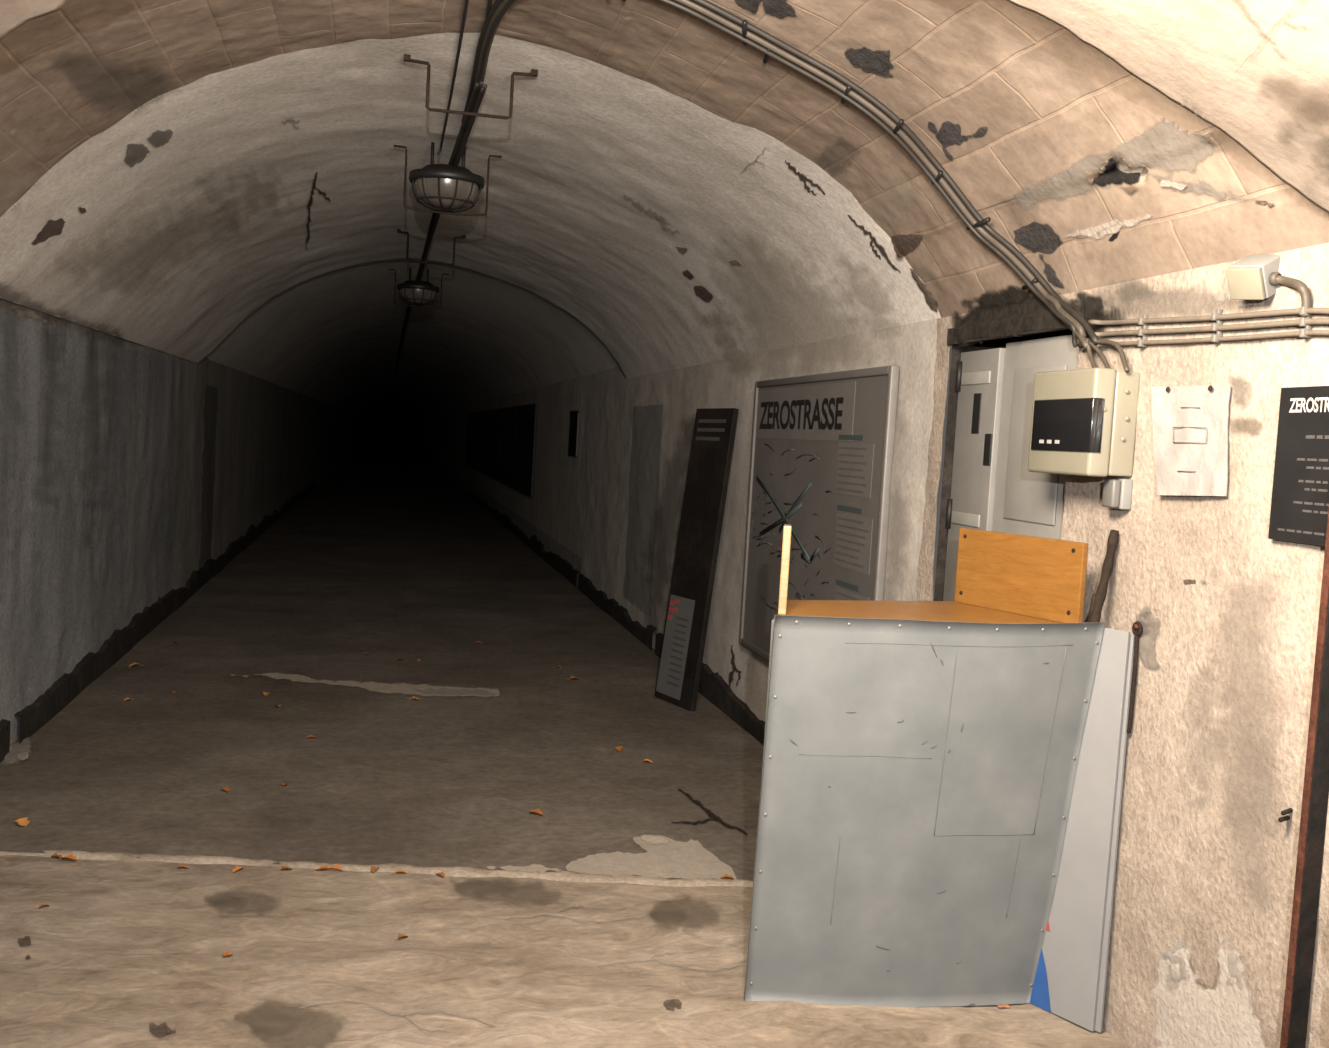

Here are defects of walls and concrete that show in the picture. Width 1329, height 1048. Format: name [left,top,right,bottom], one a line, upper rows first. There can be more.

peeling [124,130,173,167]
spalling [1085,158,1140,194]
spalling [1159,180,1186,190]
crack [306,172,331,249]
crack [671,789,747,835]
peeling [487,835,737,879]
flaking render [1151,936,1265,1048]